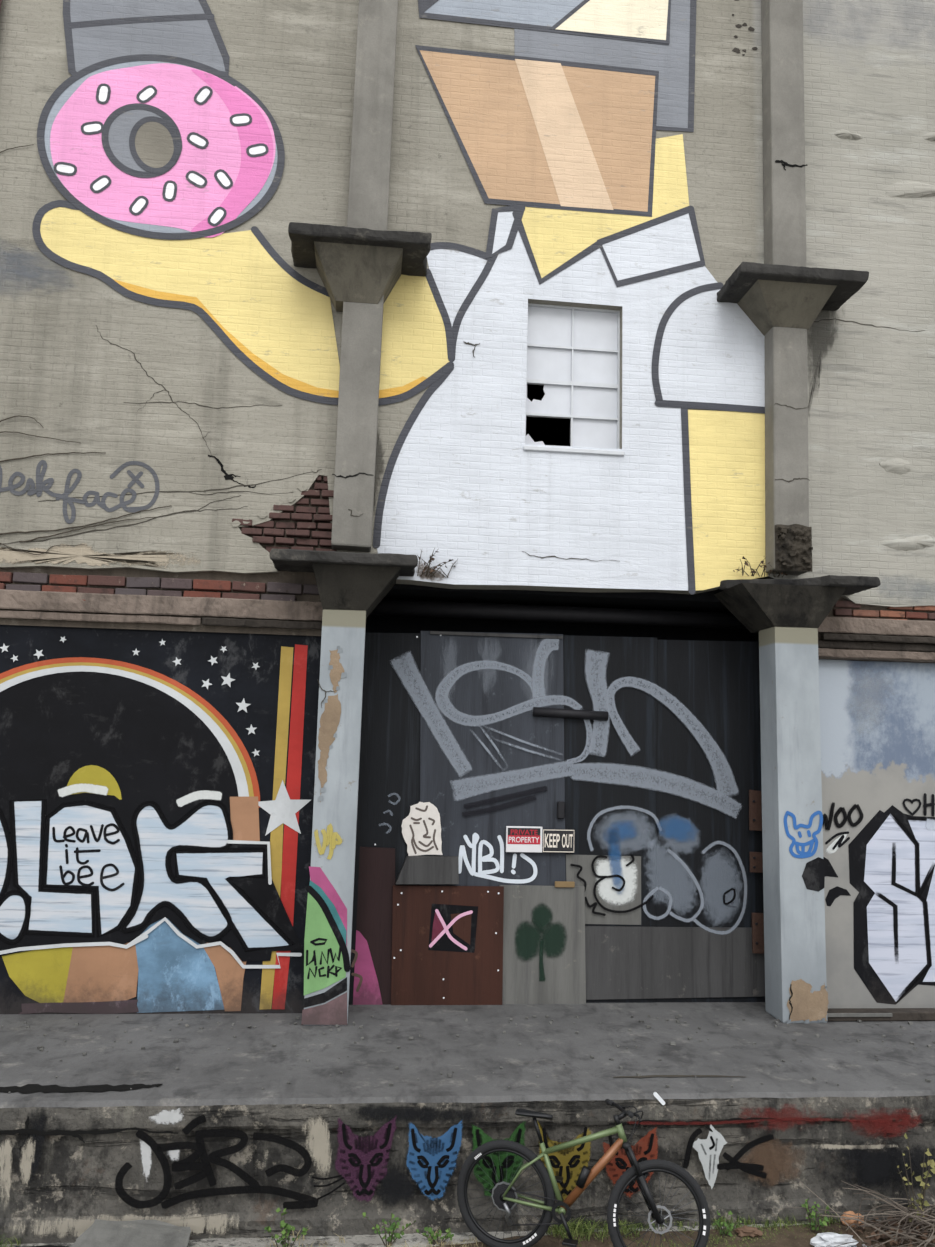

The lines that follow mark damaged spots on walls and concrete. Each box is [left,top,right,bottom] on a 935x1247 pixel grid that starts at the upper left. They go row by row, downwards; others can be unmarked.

crack [775,160,808,170]
damp [809,310,835,404]
crack [2,325,373,544]
spalling [231,467,337,553]
crack [522,551,620,562]
spalling [775,524,813,572]
peeling [318,646,347,803]
peeling [787,979,829,1024]